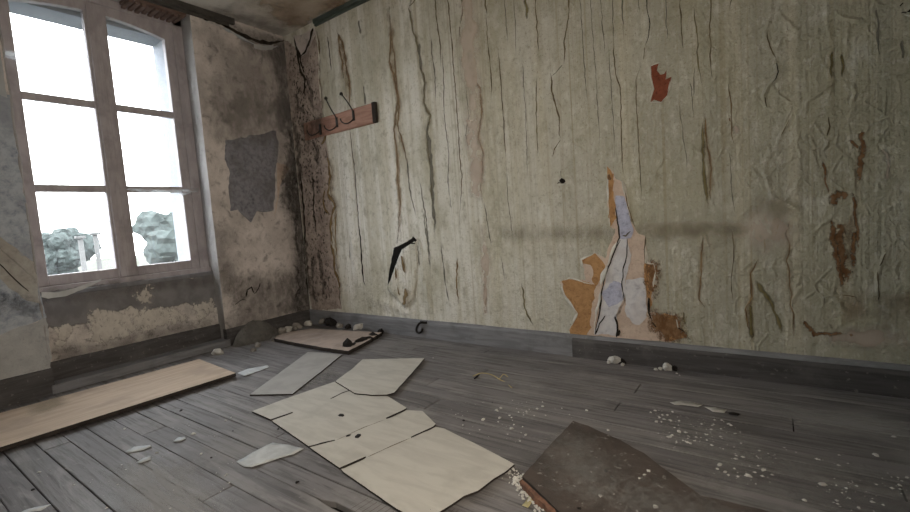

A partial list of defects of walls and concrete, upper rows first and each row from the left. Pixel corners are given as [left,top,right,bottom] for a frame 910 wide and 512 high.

peeling [0,237,217,380]
flaking render [119,0,186,24]
peeling [201,18,342,310]
leakage [274,44,340,311]
leakage [338,35,350,103]
leakage [395,256,408,305]
leakage [389,0,506,265]
peeling [560,167,687,342]
peeling [649,62,672,103]
corrosion [803,321,853,337]
corrosion [822,163,860,297]
corrosion [850,132,866,180]